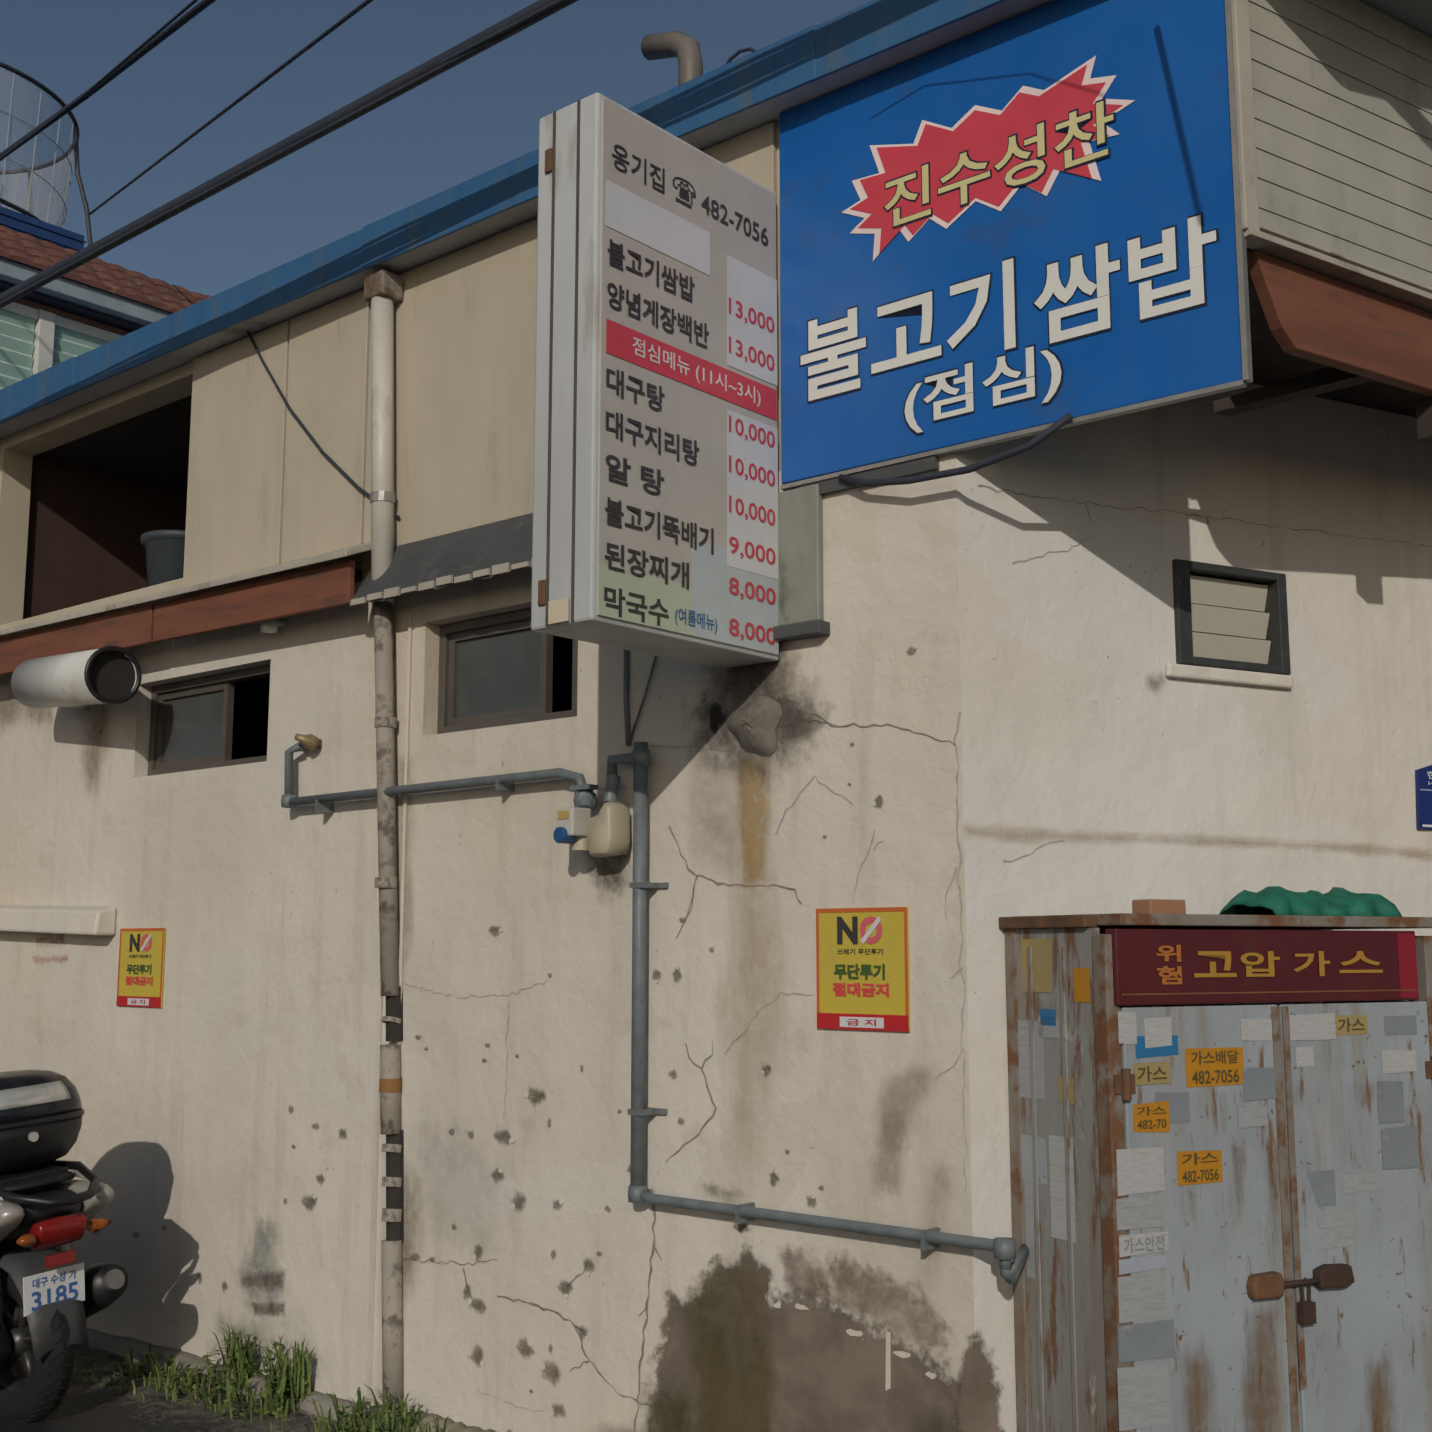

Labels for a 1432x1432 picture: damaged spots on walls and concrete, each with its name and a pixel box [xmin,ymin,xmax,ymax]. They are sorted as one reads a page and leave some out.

corrosion [740,760,765,878]
crack [775,775,852,835]
crack [668,826,801,939]
crack [793,705,967,1192]
crack [665,991,809,1163]
crack [403,1204,662,1431]
leakage [785,1250,938,1342]
corrosion [1373,1372,1388,1432]